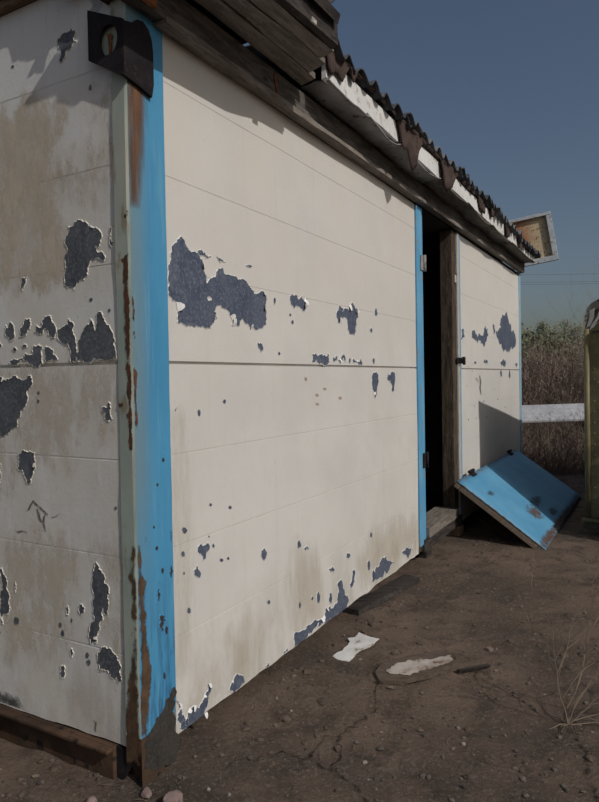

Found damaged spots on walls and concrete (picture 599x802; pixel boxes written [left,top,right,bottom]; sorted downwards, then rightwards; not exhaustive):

water stain [0,97,83,294]
peeling [0,309,117,437]
peeling [64,219,115,290]
corrosion [119,255,138,450]
corrosion [128,82,143,203]
peeling [167,236,276,331]
peeling [336,302,360,336]
peeling [461,311,517,379]
peeling [59,561,123,683]
corrosion [126,547,152,765]
peeling [282,566,356,654]
peeling [144,683,212,771]